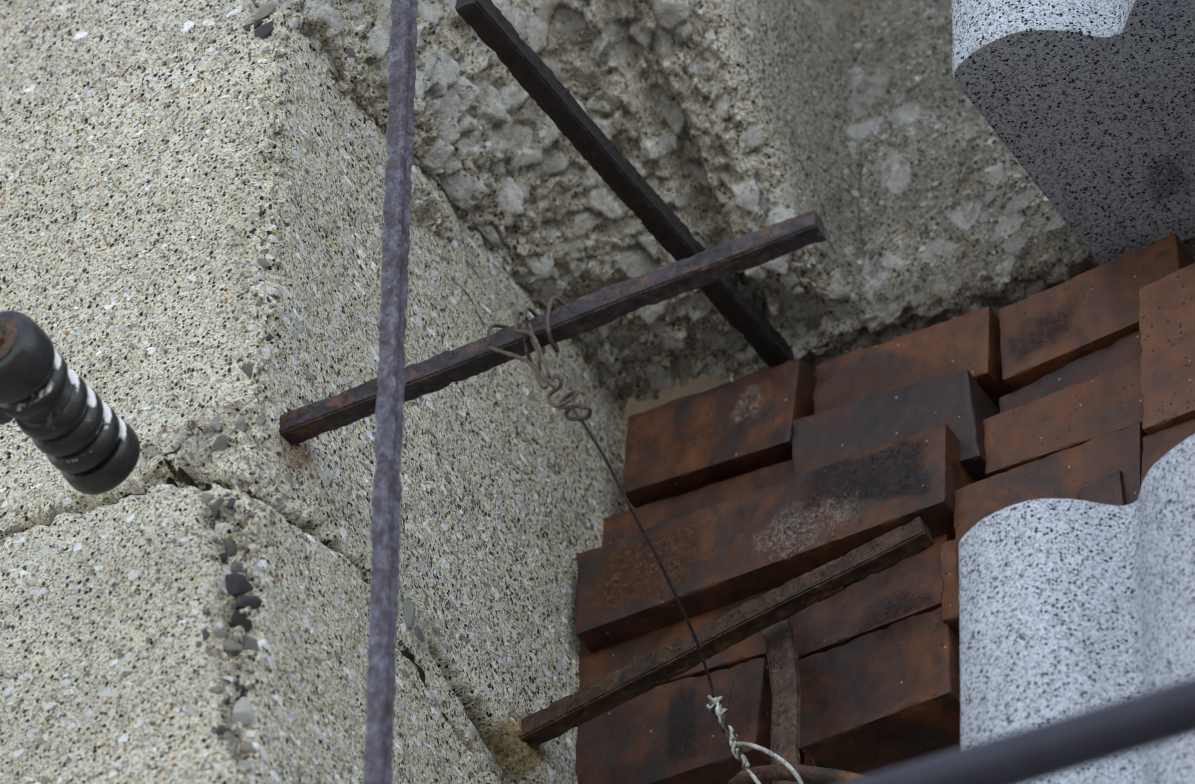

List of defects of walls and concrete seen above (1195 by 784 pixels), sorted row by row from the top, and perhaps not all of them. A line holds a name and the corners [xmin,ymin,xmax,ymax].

spalling [345,47,374,66]
spalling [683,66,717,101]
spalling [409,196,452,244]
crack [119,426,263,501]
crack [396,646,460,740]